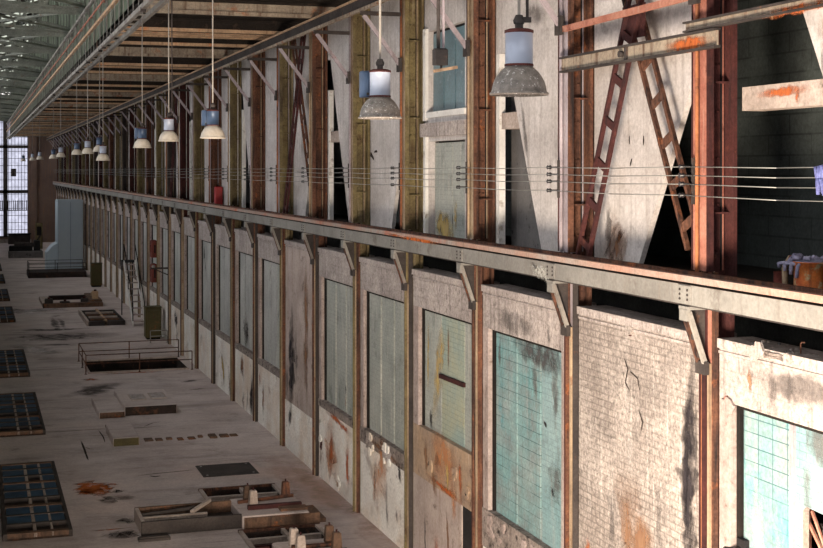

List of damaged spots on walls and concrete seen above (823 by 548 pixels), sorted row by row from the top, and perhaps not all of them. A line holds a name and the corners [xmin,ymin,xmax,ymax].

corrosion [672,37,704,53]
corrosion [766,86,798,100]
leakage [773,376,823,401]
corrosion [424,441,461,511]
leakage [684,433,697,505]